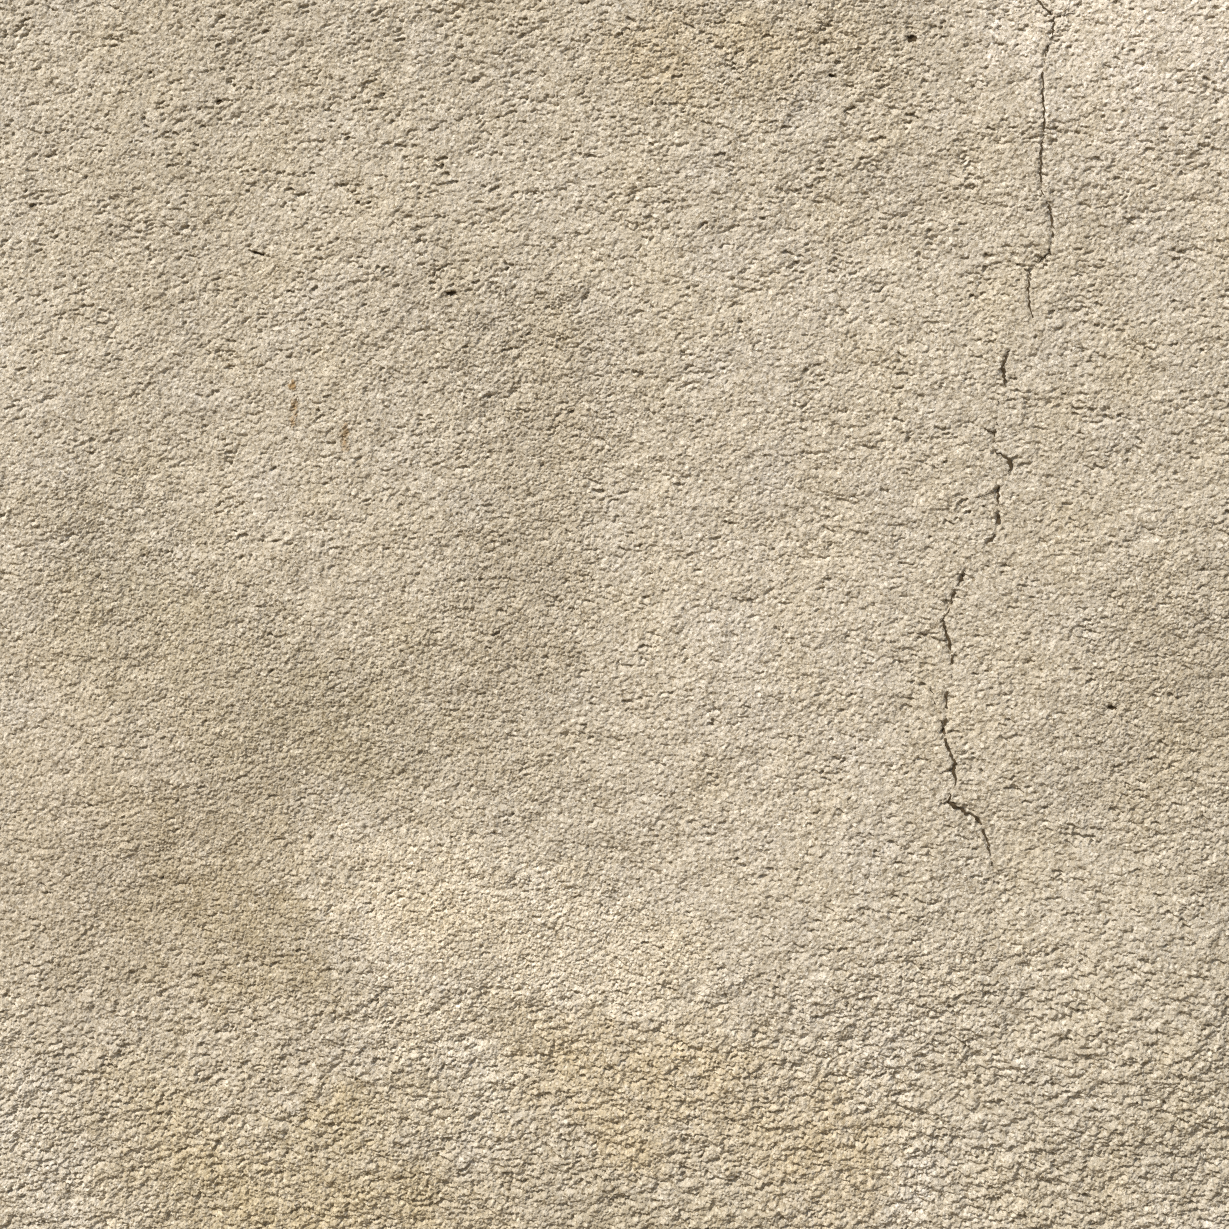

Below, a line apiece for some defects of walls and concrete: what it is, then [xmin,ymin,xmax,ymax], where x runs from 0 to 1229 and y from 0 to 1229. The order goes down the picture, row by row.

crack [1015,0,1072,318]
crack [976,350,1013,544]
crack [917,570,995,876]